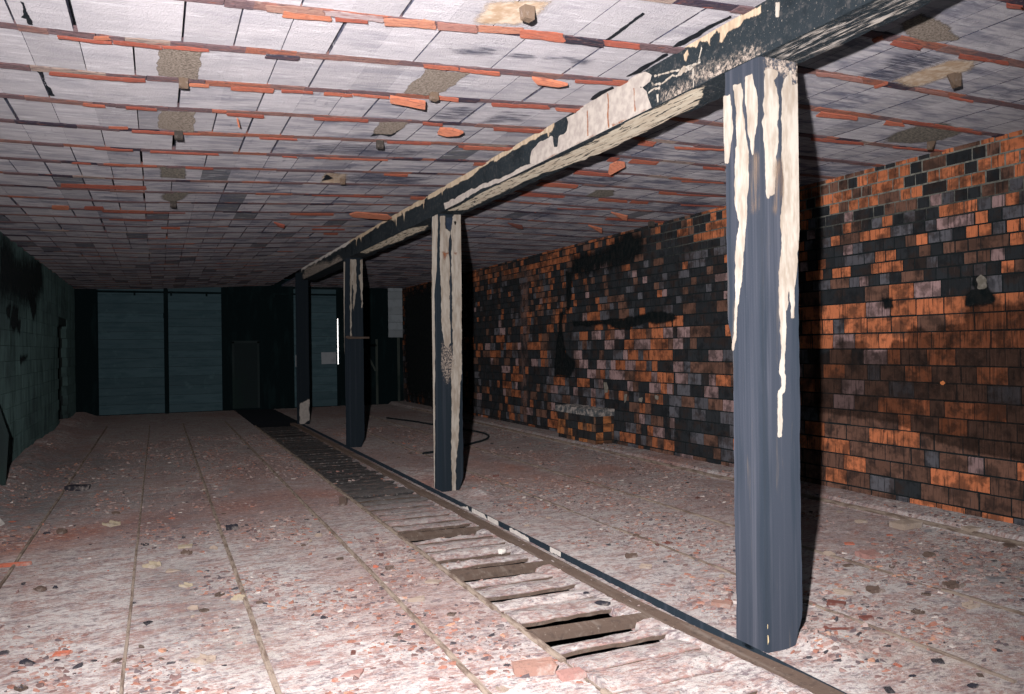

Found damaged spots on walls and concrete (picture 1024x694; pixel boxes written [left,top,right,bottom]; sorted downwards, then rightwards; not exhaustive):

flaking render [265,0,641,50]
flaking render [49,35,209,88]
flaking render [212,109,264,118]
flaking render [231,86,390,99]
flaking render [313,117,431,145]
flaking render [404,64,500,102]
flaking render [444,0,959,230]
flaking render [816,54,1009,103]
flaking render [883,120,982,152]
flaking render [360,225,428,253]
damp [723,68,799,438]
damp [301,123,554,491]